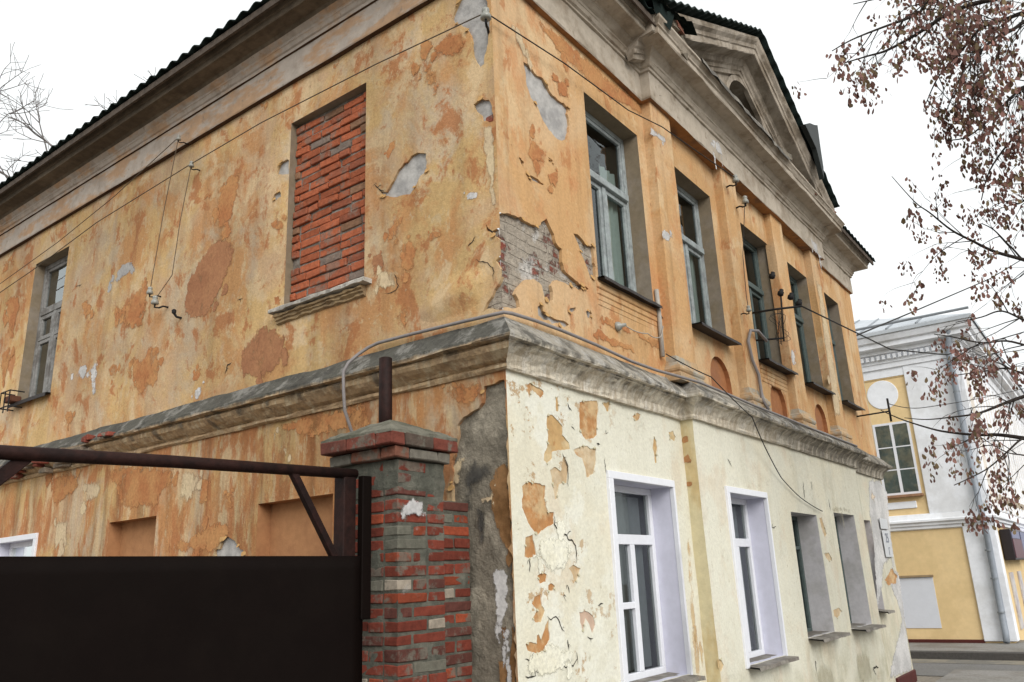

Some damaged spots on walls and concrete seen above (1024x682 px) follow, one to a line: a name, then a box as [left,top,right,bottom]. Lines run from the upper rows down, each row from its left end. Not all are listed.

flaking render [411,0,490,95]
peeling [512,21,642,193]
flaking render [379,154,429,198]
flaking render [464,95,660,353]
spalling [62,431,115,450]
peeling [3,461,246,556]
flaking render [441,381,611,682]